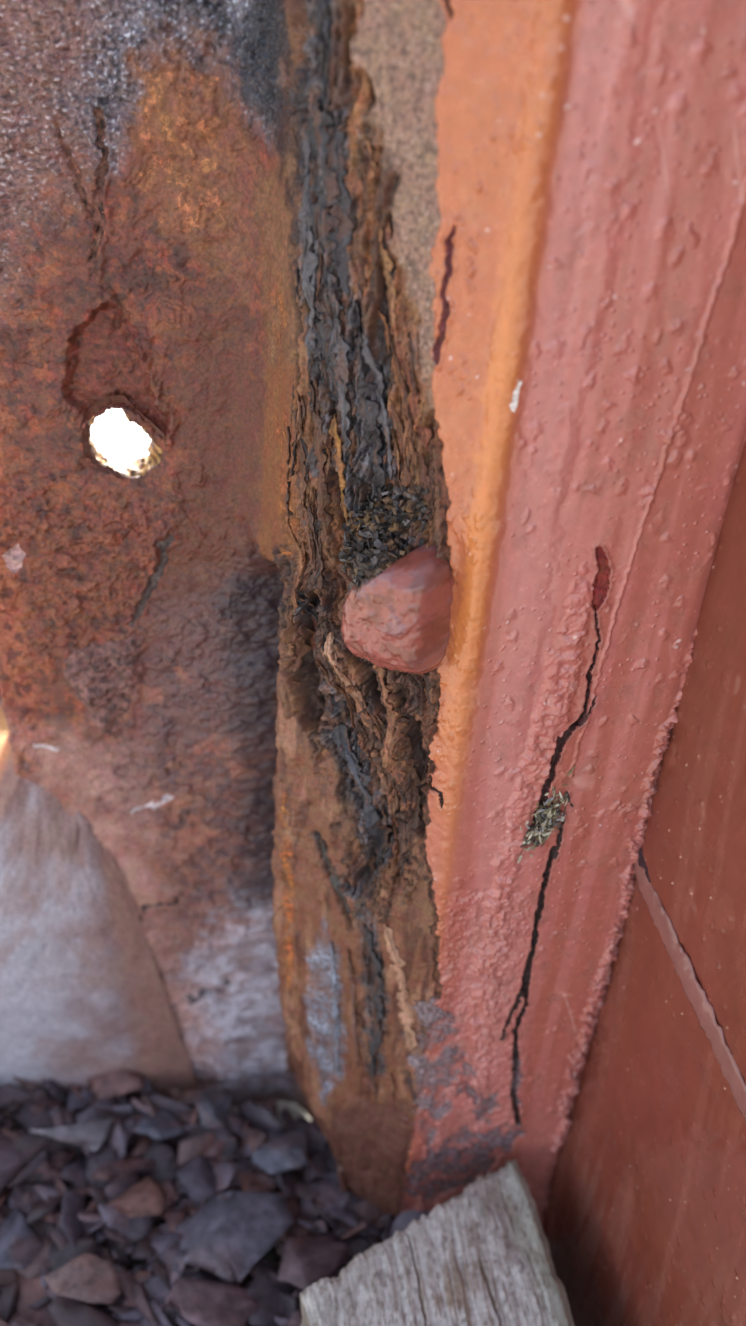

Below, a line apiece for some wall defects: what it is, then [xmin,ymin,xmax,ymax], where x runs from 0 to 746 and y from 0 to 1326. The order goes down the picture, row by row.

rust [138,67,228,232]
crack [433,226,456,365]
rust [79,395,165,480]
peeling [432,426,453,573]
rust [63,637,143,736]
crack [500,546,611,1127]
peeling [405,668,525,1200]